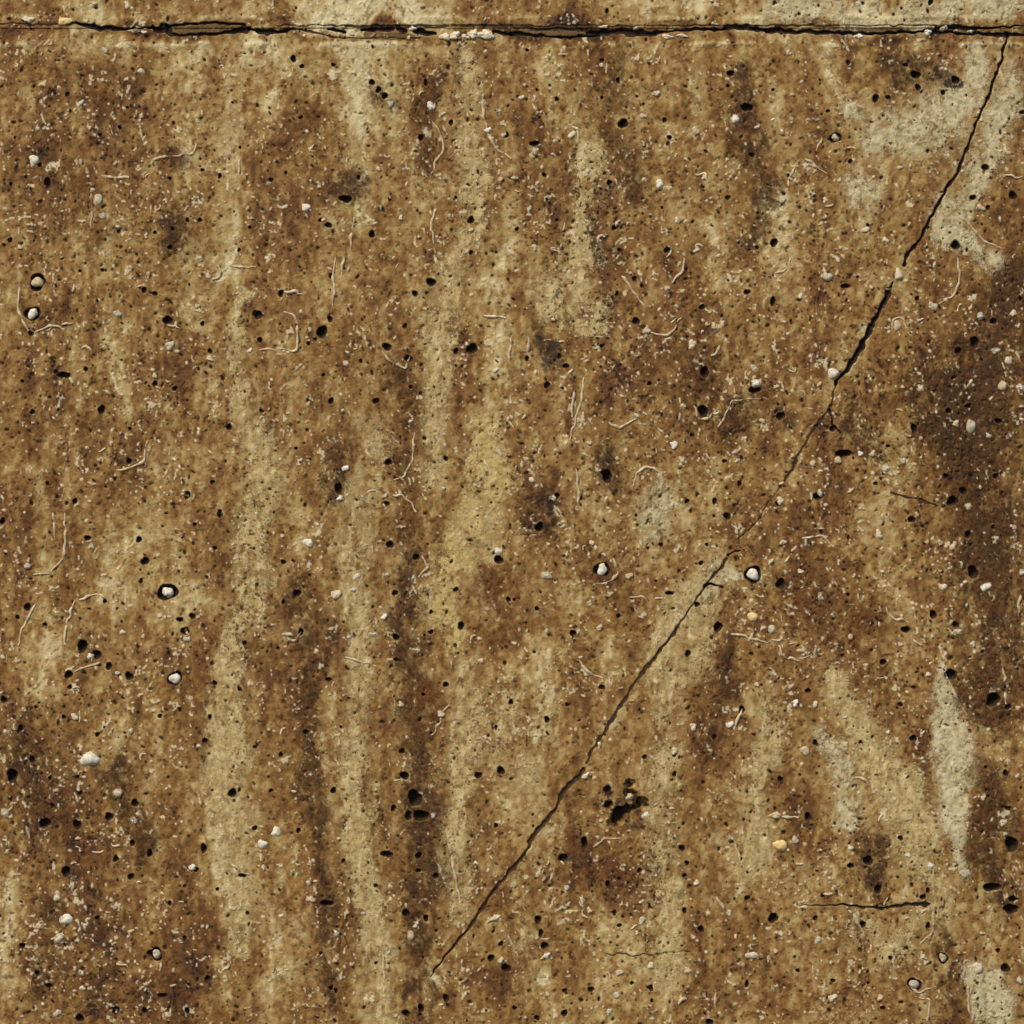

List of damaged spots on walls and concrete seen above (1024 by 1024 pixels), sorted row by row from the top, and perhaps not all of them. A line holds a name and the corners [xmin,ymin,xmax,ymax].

crack [0,16,1024,267]
damp [528,44,647,372]
damp [722,60,783,257]
damp [200,45,560,1024]
damp [637,472,670,543]
crack [430,282,893,978]
crack [890,492,938,507]
damp [813,41,1024,1024]
damp [95,747,162,863]
damp [593,554,740,992]
damp [737,692,786,885]
crack [801,901,930,910]